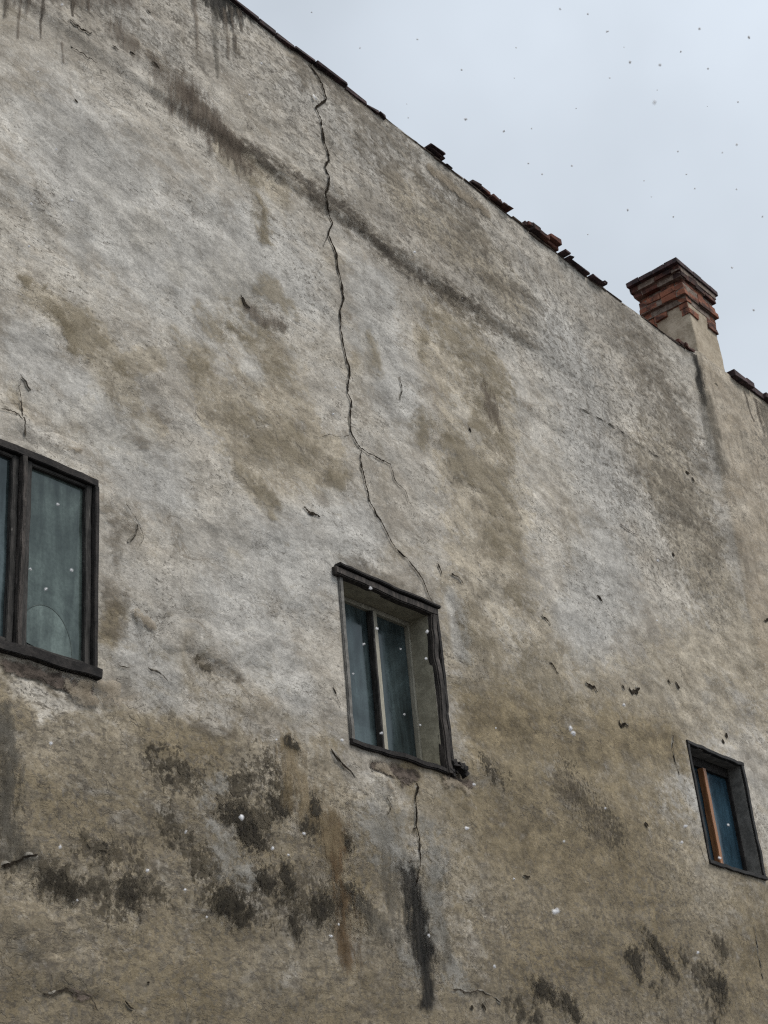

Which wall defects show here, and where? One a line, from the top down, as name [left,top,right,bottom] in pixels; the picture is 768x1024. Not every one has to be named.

damp [4,0,90,36]
damp [194,0,254,56]
damp [154,57,513,452]
crack [309,64,463,601]
mould [30,824,164,920]
mould [145,741,192,786]
mould [162,817,373,948]
mould [210,759,355,855]
mould [283,733,301,755]
crack [387,783,421,885]
damp [398,860,437,1010]
mould [624,923,734,1024]